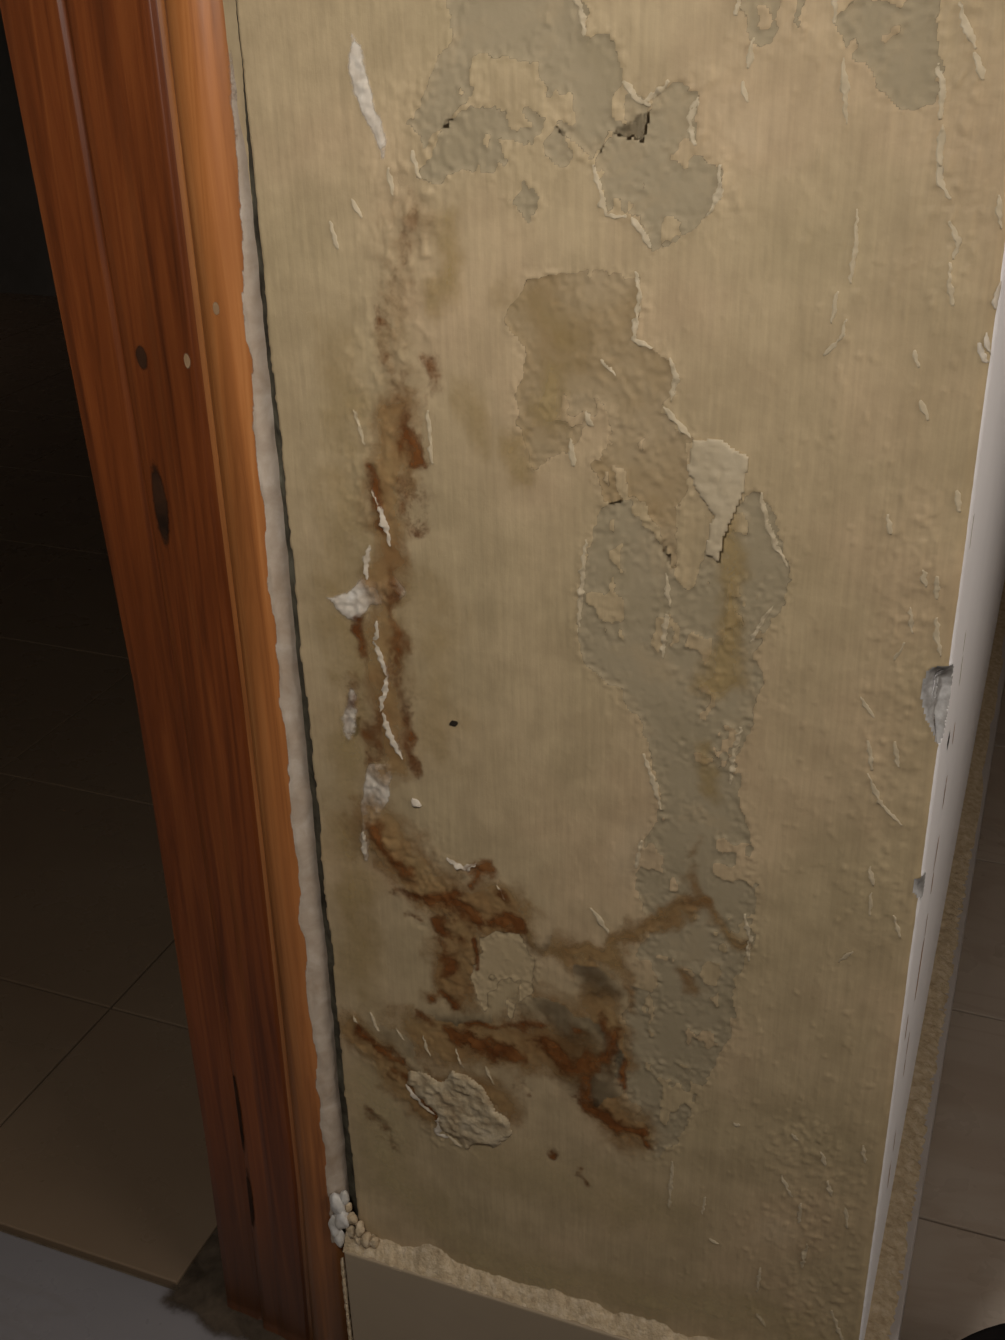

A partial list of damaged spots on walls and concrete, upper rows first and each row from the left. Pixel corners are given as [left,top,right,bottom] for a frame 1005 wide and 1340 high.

peeling [407,0,724,251]
peeling [831,0,952,200]
peeling [362,545,371,580]
peeling [371,490,391,547]
corrosion [351,396,426,778]
peeling [372,621,403,760]
peeling [504,269,792,1208]
spalling [920,617,954,749]
peeling [446,858,477,872]
peeling [470,931,535,1019]
corrosion [339,801,748,1148]
spalling [406,1048,512,1150]